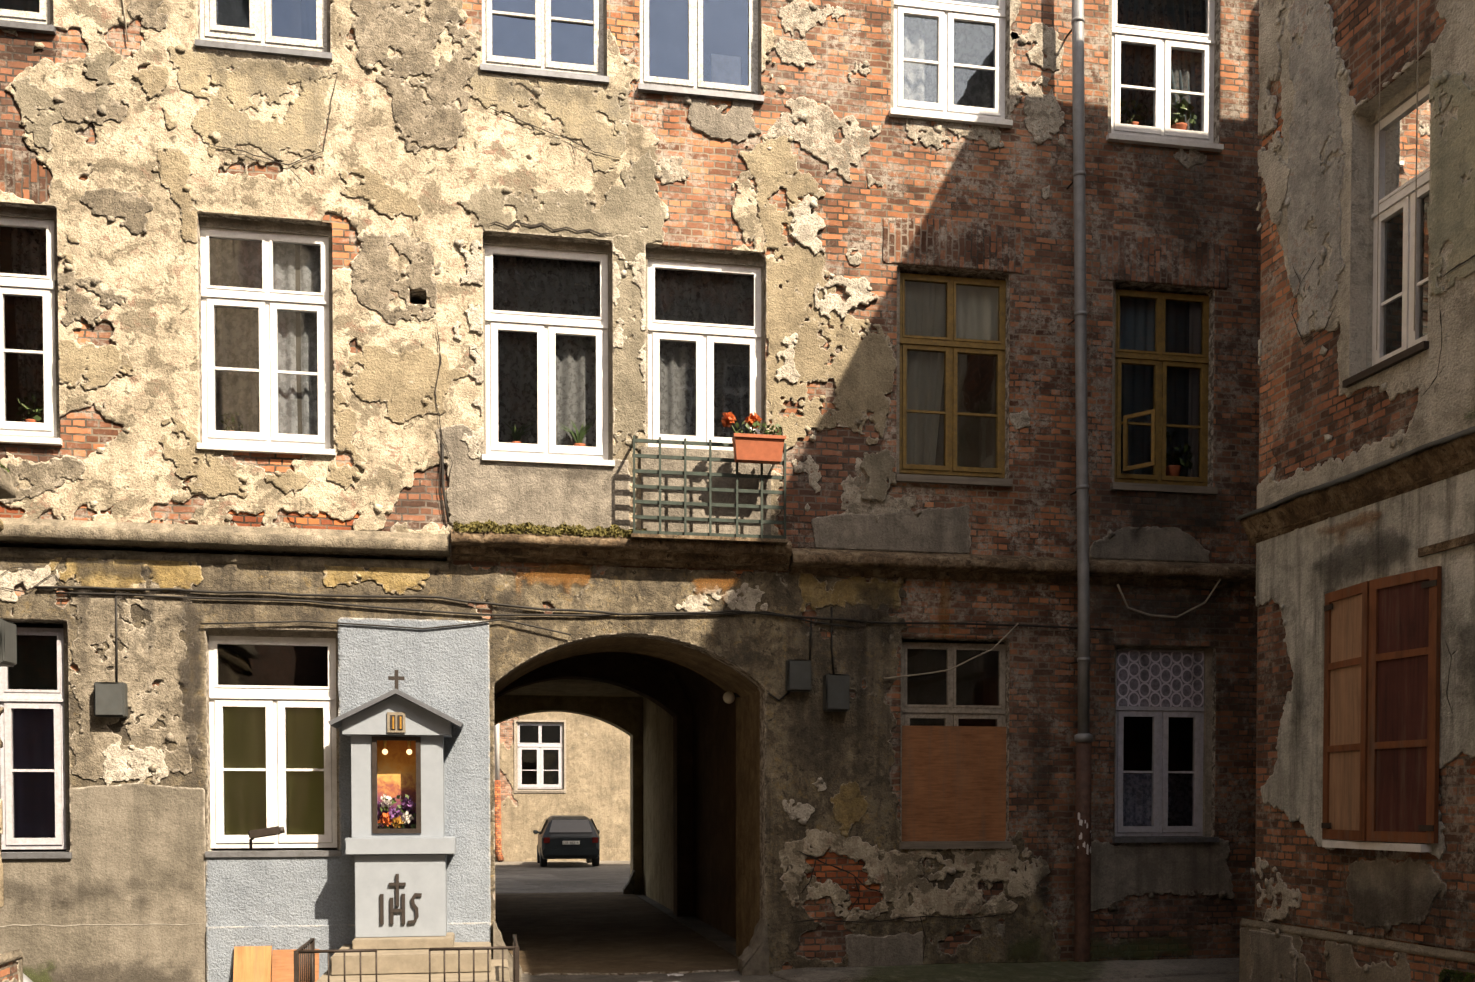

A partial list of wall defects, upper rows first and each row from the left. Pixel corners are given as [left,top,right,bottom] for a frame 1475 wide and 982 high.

peeling [0,233,136,521]
peeling [0,0,337,243]
peeling [148,304,484,532]
peeling [322,164,441,325]
peeling [351,0,922,549]
peeling [1256,0,1447,483]
peeling [1427,70,1475,296]
damp [1103,597,1220,627]
flaking render [0,961,19,982]
peeling [779,777,1050,963]
flaking render [1250,599,1475,982]